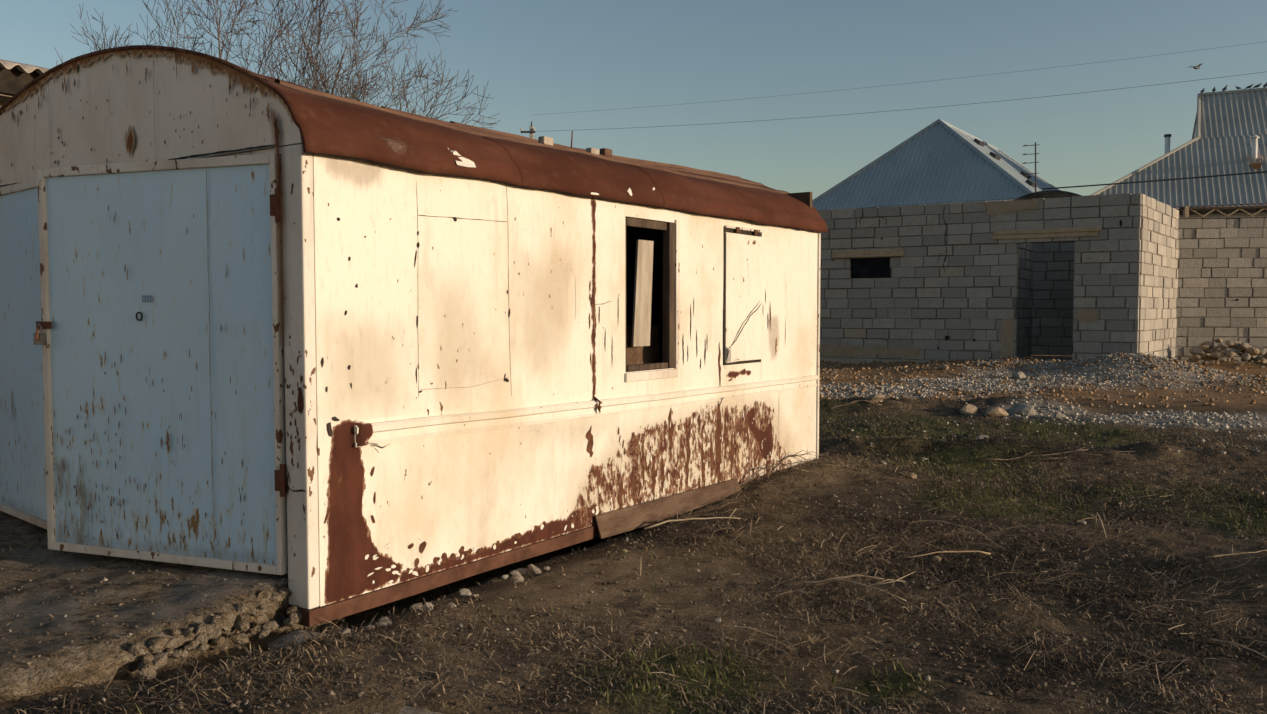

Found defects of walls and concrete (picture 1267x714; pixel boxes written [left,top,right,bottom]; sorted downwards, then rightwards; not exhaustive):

rust [1,49,293,324]
rust [589,197,602,413]
rust [51,395,146,547]
rust [324,419,481,604]
rust [575,342,791,528]